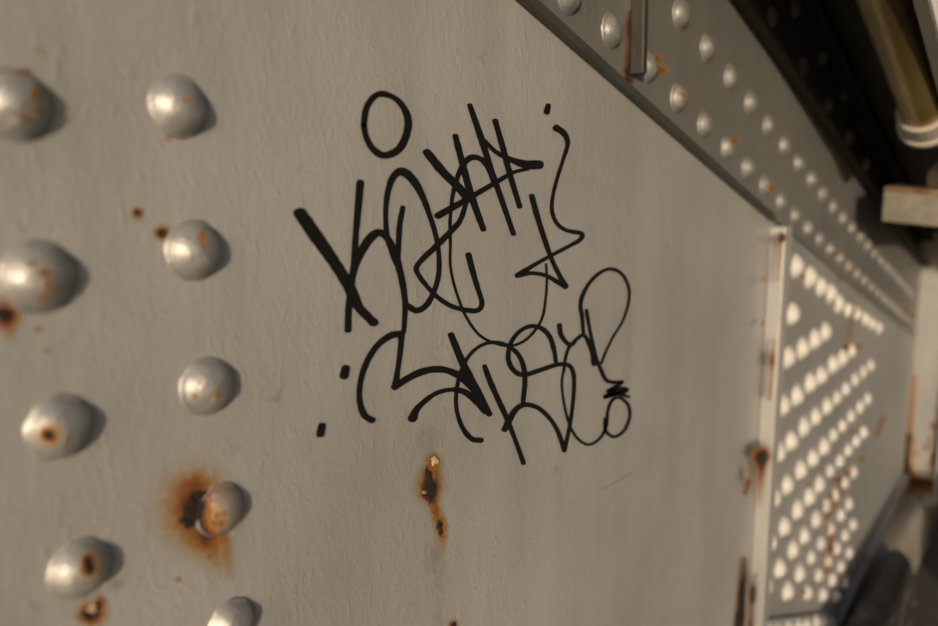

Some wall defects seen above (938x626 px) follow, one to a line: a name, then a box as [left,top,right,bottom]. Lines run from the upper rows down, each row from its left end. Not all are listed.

rust [0,302,20,332]
rust [39,425,58,444]
rust [167,472,229,561]
rust [417,454,447,542]
rust [80,553,98,577]
rust [734,558,757,626]